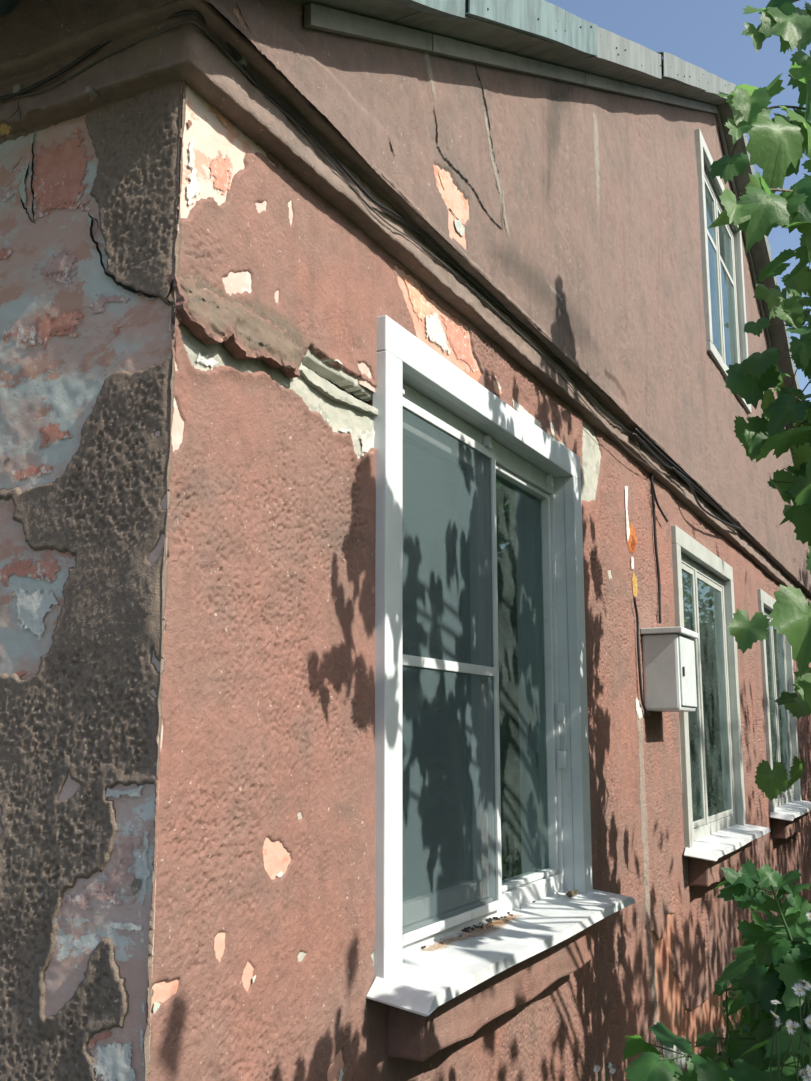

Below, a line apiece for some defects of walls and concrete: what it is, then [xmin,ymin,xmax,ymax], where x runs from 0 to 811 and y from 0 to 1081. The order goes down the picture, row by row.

crack [88,213,173,304]
peeling [176,81,276,230]
peeling [433,164,469,249]
crack [433,65,507,248]
peeling [395,265,482,382]
peeling [0,114,378,679]
peeling [58,773,81,801]
peeling [262,837,291,879]
peeling [44,784,178,1081]
corrosion [439,908,521,944]
peeling [650,913,743,1071]
peeling [327,1049,344,1081]